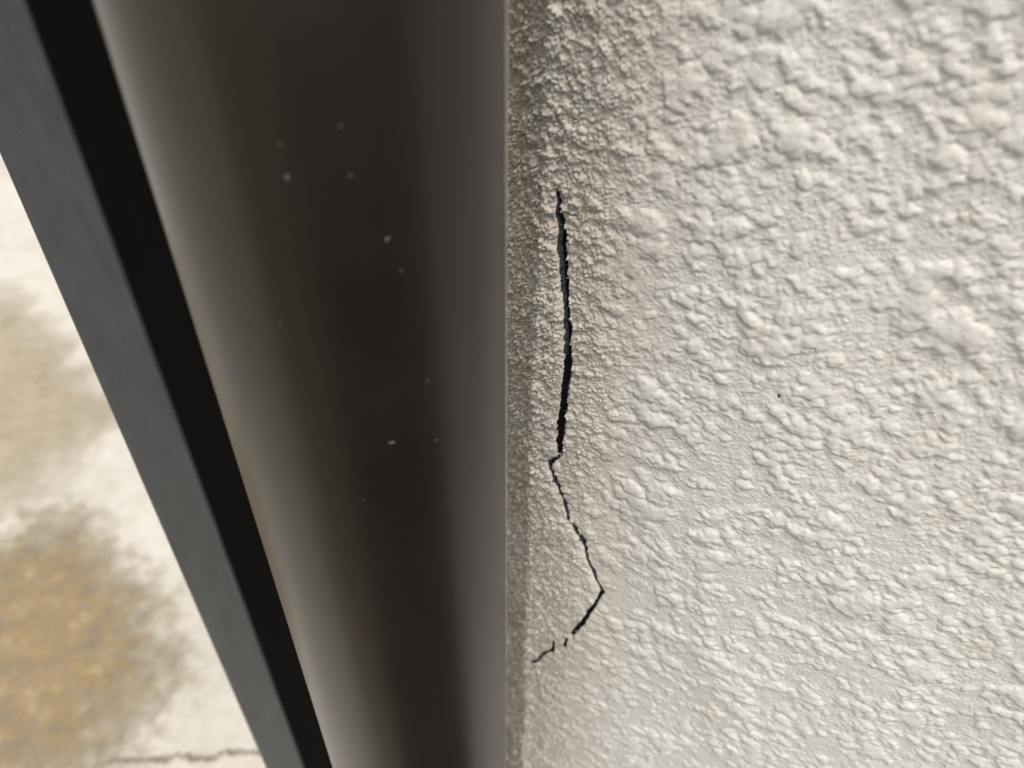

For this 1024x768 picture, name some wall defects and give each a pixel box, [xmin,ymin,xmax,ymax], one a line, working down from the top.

crack [531,189,605,663]